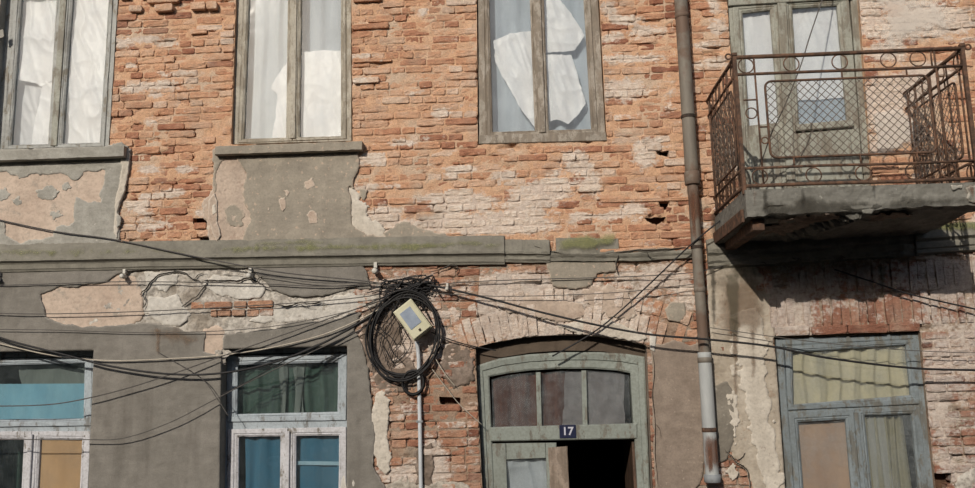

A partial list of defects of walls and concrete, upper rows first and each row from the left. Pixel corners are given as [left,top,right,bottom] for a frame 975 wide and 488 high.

peeling [0,169,105,243]
flaking render [41,0,740,488]
flaking render [859,0,975,223]
flaking render [697,252,975,488]